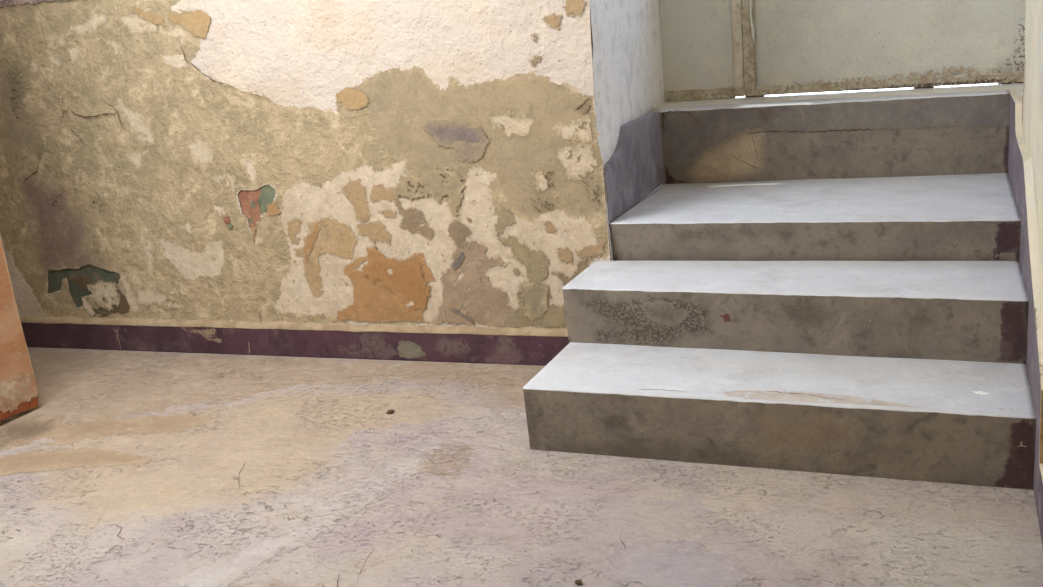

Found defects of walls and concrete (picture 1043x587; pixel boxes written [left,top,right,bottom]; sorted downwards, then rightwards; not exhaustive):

peeling [29,11,189,75]
crack [181,45,270,101]
crack [56,97,122,141]
peeling [116,97,158,172]
peeling [489,107,535,138]
peeling [551,115,598,181]
peeling [48,137,604,359]
peeling [0,372,38,414]